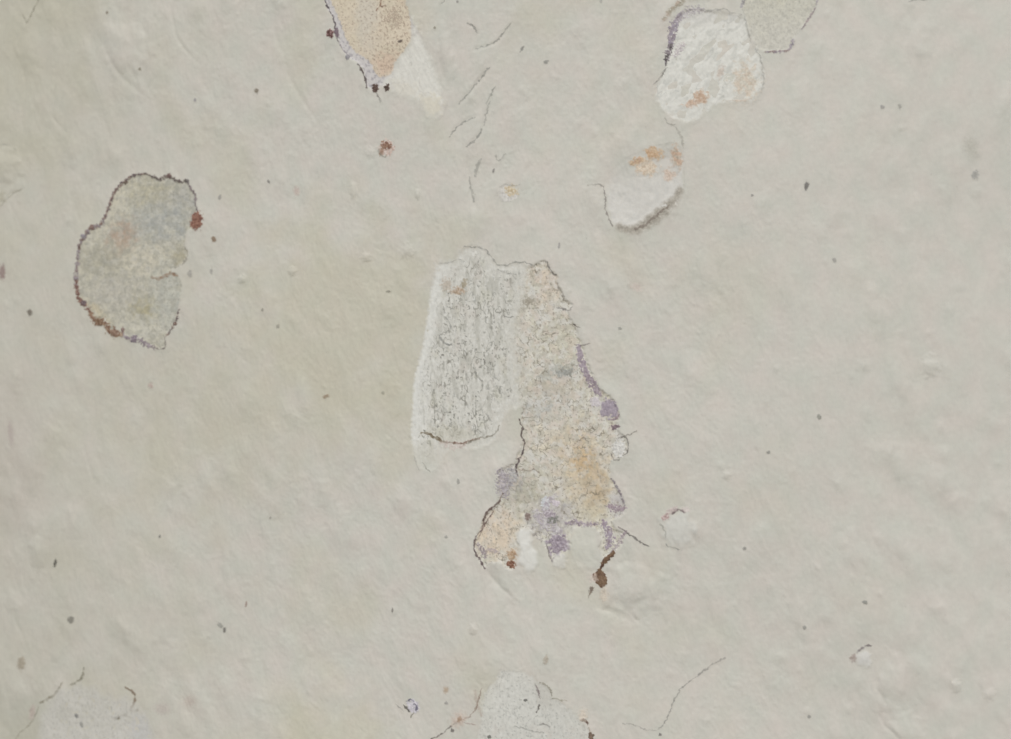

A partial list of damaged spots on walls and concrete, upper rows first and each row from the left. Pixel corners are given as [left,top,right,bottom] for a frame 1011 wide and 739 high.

peeling [324,0,448,121]
peeling [73,171,204,351]
peeling [409,239,637,578]
peeling [473,668,598,739]